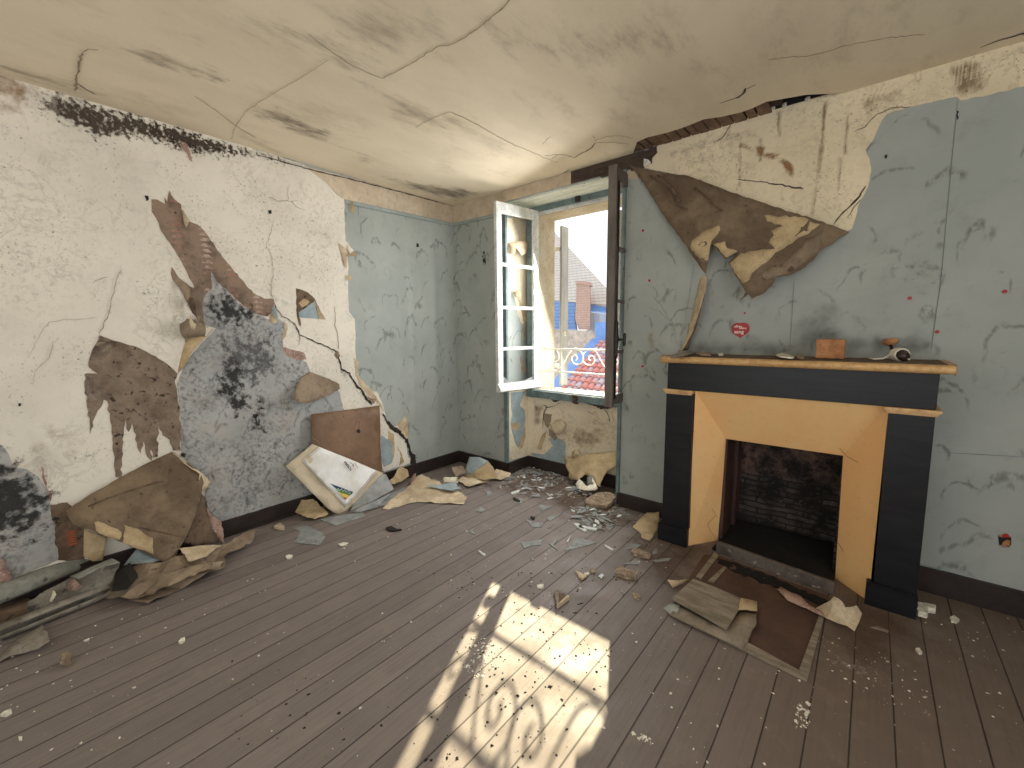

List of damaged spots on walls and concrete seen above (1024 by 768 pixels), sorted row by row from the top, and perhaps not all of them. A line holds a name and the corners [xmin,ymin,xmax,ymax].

crack [74,49,95,95]
water stain [38,92,288,165]
crack [195,0,510,140]
crack [416,112,629,173]
peeling [643,41,1024,231]
peeling [0,75,416,515]
water stain [207,290,275,433]
crack [266,228,413,457]
peeling [509,390,528,460]
peeling [85,529,133,556]